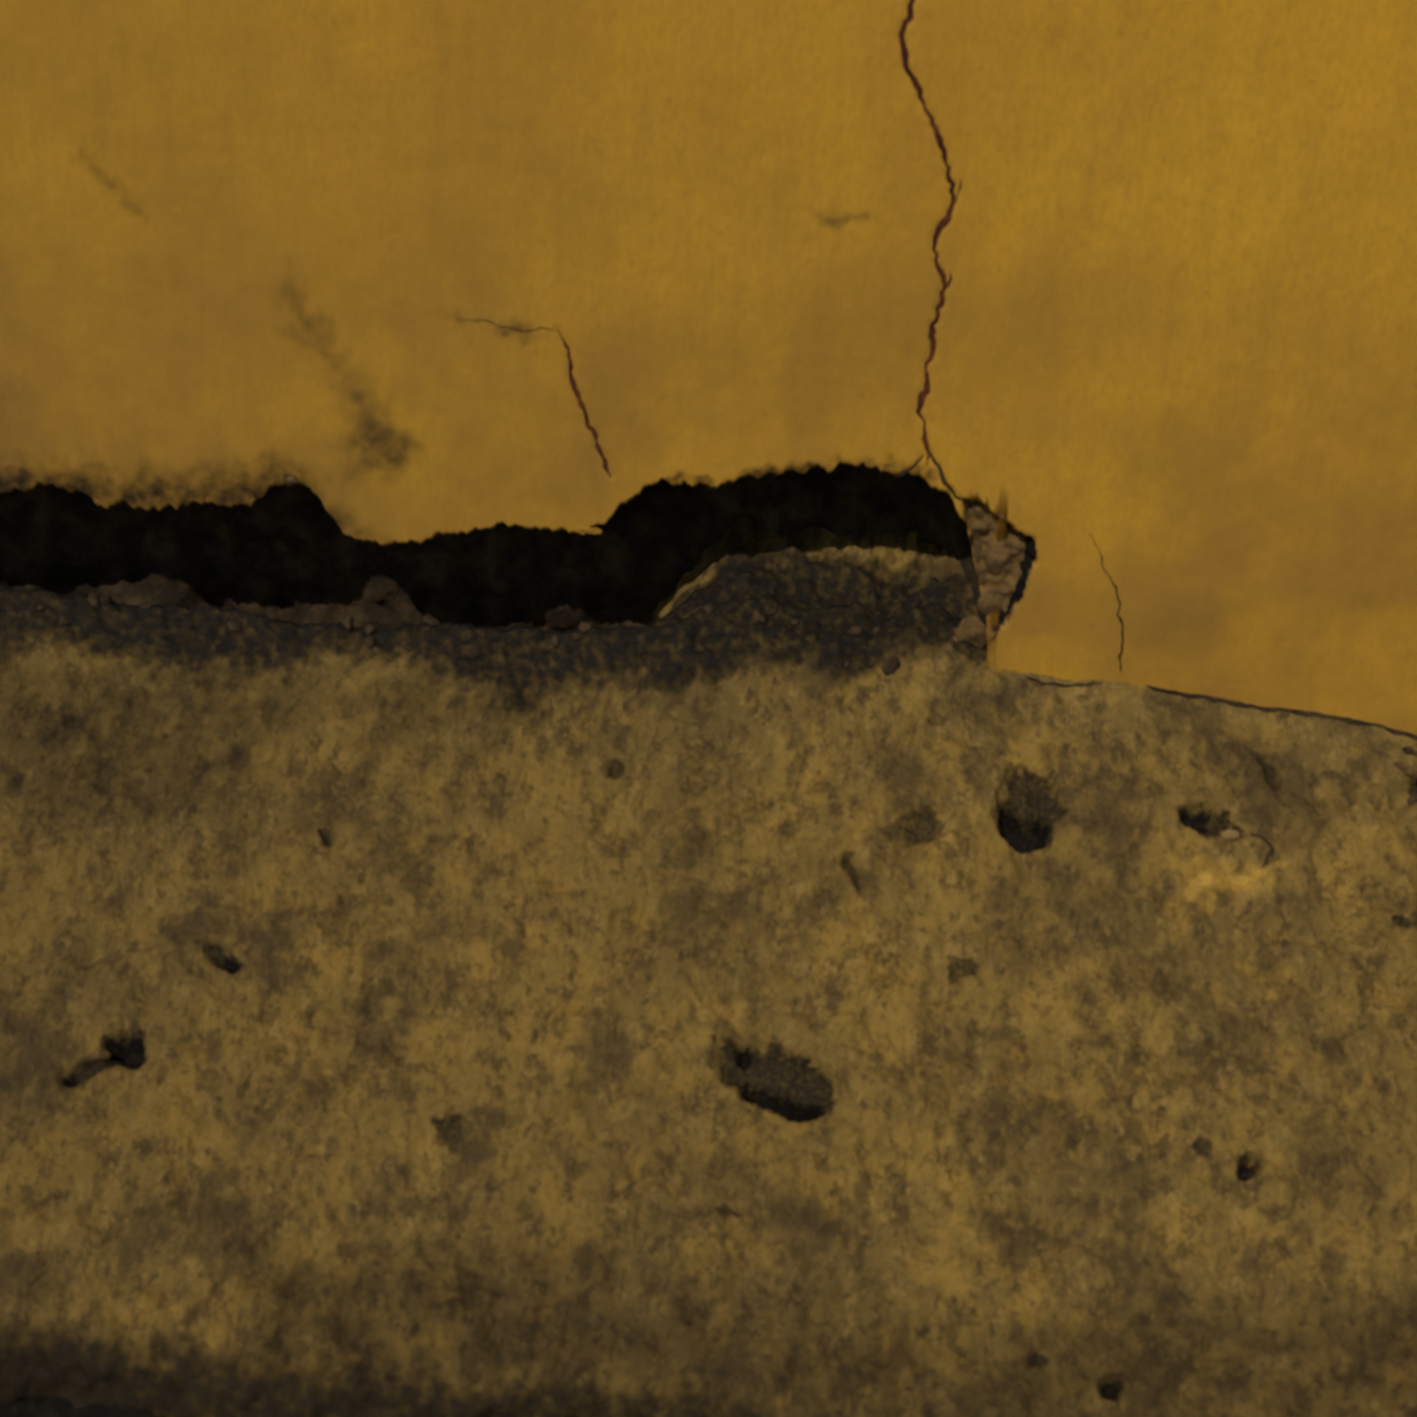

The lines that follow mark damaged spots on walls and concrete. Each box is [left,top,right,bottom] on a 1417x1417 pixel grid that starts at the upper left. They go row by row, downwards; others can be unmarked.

crack [896,0,966,503]
crack [471,319,611,477]
spalling [0,463,1037,662]
spalling [881,656,900,676]
spalling [996,769,1067,854]
spalling [1179,804,1243,841]
spalling [1393,746,1417,806]
spalling [62,1029,147,1087]
spalling [713,1036,834,1123]